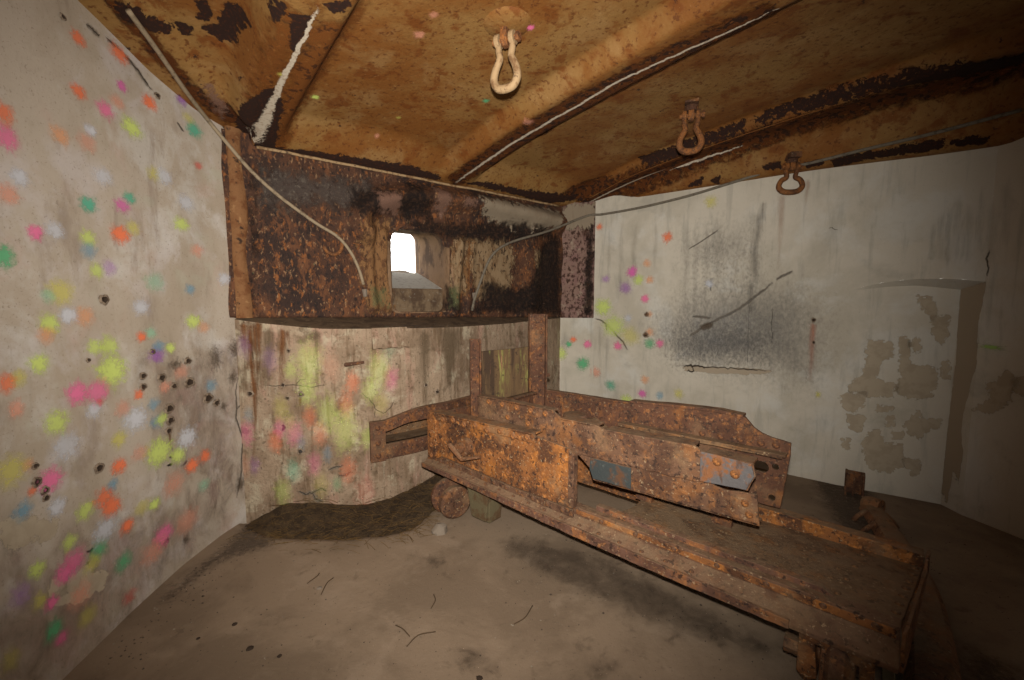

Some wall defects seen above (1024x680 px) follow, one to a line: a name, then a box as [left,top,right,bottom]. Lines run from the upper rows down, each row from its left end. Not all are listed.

peeling [838,283,986,502]